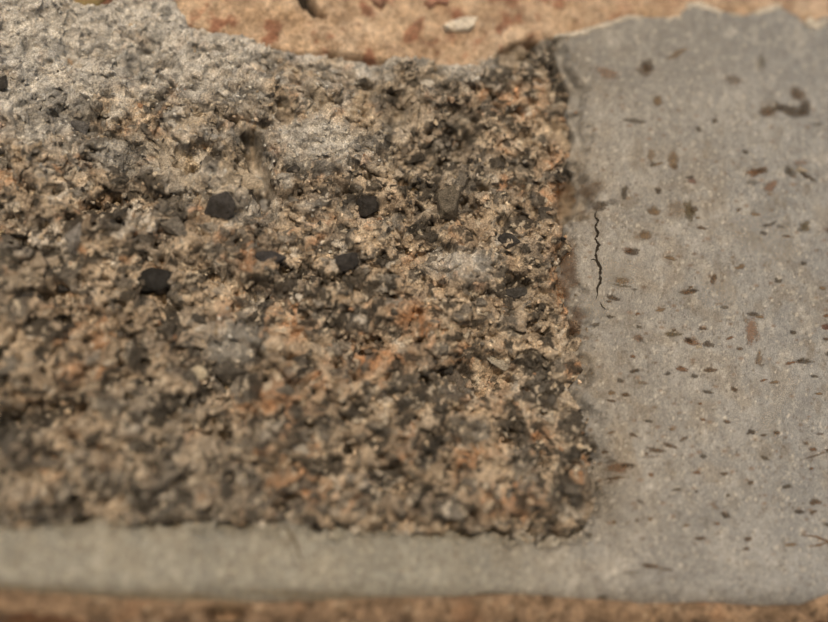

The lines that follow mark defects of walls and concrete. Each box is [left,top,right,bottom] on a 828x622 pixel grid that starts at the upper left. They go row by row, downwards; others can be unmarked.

spalling [0,0,642,551]
crack [591,210,605,309]